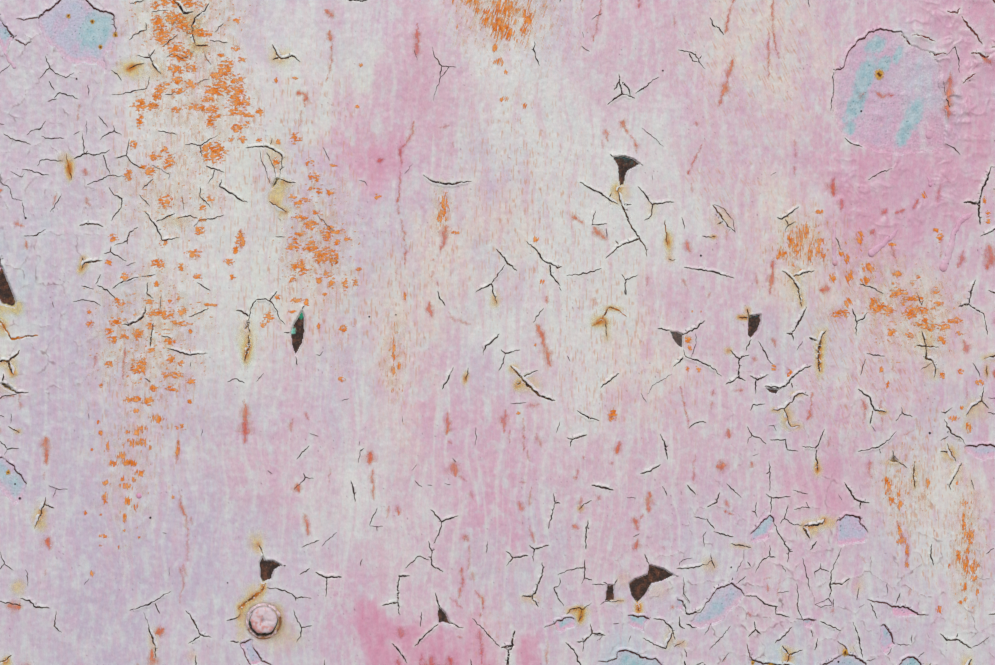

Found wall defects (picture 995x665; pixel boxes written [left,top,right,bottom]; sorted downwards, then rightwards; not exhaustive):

corrosion [452,0,547,74]
peeling [833,25,947,155]
peeling [0,249,16,308]
crack [0,0,300,366]
corrosion [89,0,264,532]
corrosion [270,159,361,313]
peeling [614,155,641,187]
corrosion [769,210,970,352]
crack [0,322,38,455]
crack [482,268,931,665]
crack [383,509,517,665]
peeling [628,564,676,631]